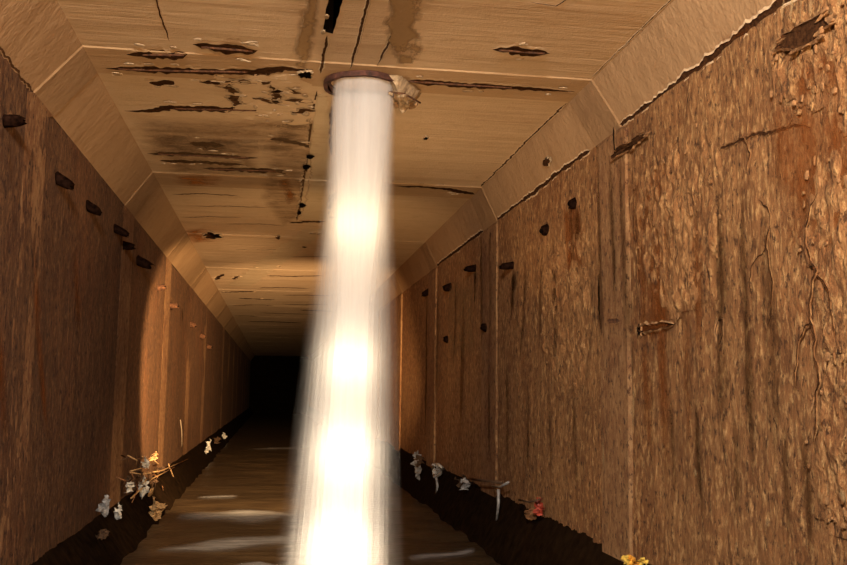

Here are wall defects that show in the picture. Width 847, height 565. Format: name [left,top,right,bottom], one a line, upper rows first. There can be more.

crack [155,0,169,40]
crack [307,36,335,155]
crack [350,0,371,69]
crack [376,35,391,68]
damp [386,0,421,63]
crack [613,0,797,153]
crack [481,103,567,186]
crack [707,104,812,171]
crack [437,149,590,266]
peeling [609,121,724,338]
peeling [763,0,847,539]